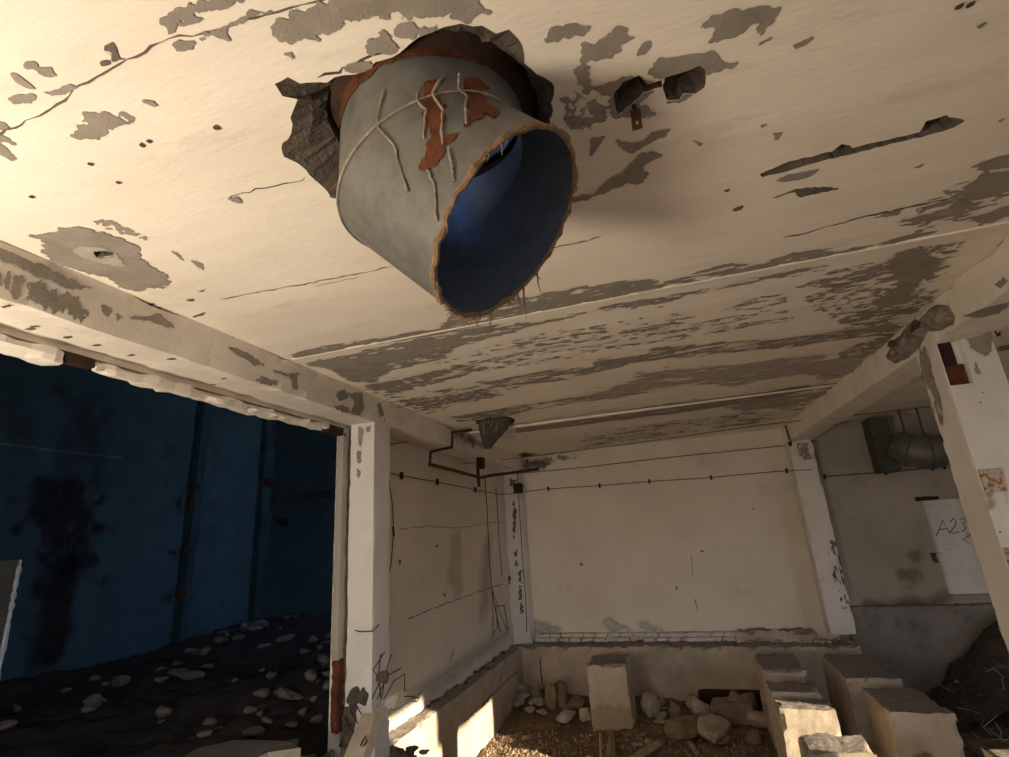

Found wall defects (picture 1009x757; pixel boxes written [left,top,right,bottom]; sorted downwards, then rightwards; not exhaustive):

crack [0,0,325,136]
crack [229,179,304,198]
corrosion [339,47,486,135]
corrosion [418,77,501,171]
peeling [159,0,780,203]
peeling [793,36,814,49]
spalling [760,115,964,198]
peeling [0,219,171,323]
peeling [101,303,174,328]
crack [225,266,391,299]
peeling [229,154,1009,478]
water stain [13,478,105,666]